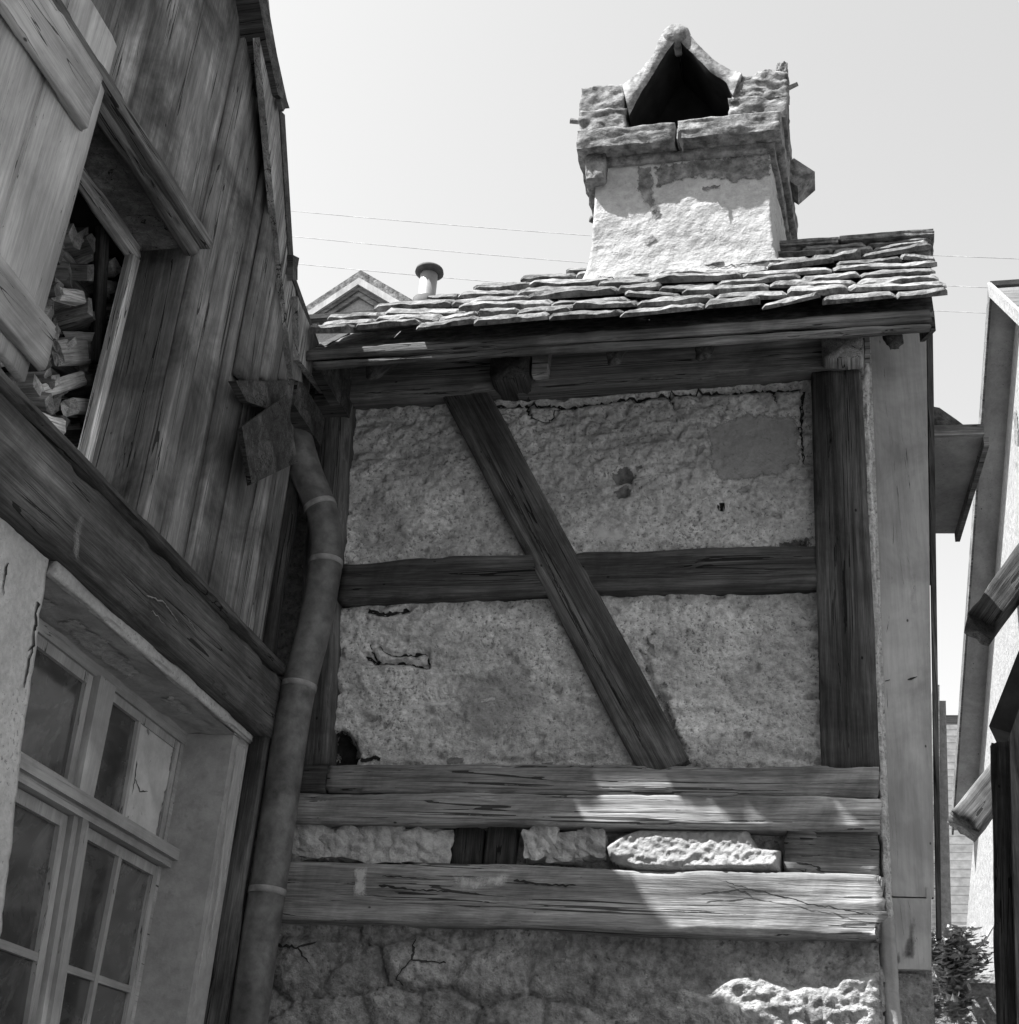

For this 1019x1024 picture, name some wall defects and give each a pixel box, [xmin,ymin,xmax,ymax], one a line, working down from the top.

crack [487,385,849,748]
crack [24,601,40,688]
spalling [336,731,381,766]
crack [278,941,317,964]
crack [396,939,446,986]